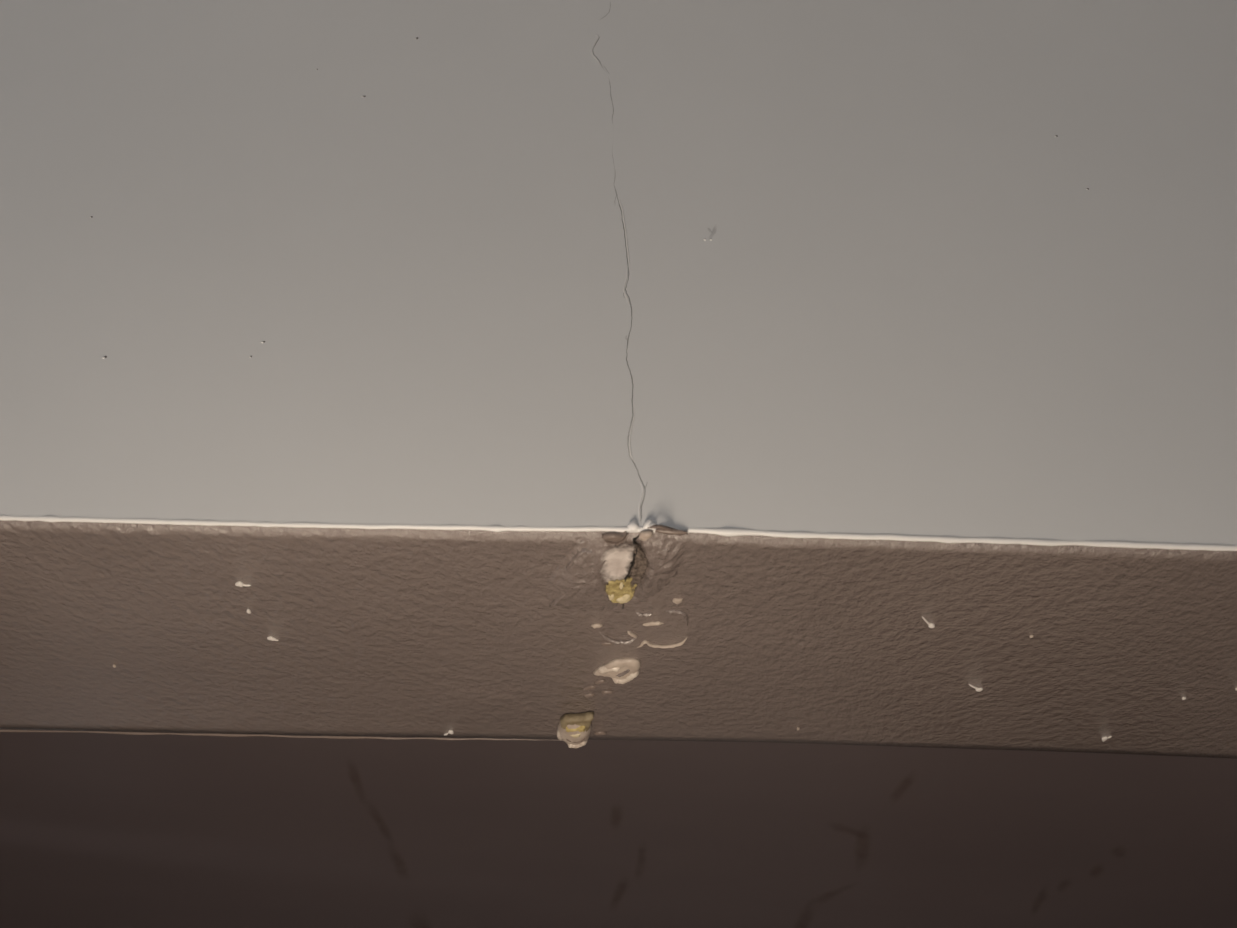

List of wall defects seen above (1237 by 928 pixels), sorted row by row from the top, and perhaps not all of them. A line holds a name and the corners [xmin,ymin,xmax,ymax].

crack [591,10,647,526]
flaking render [546,519,688,612]
peeling [584,658,641,698]